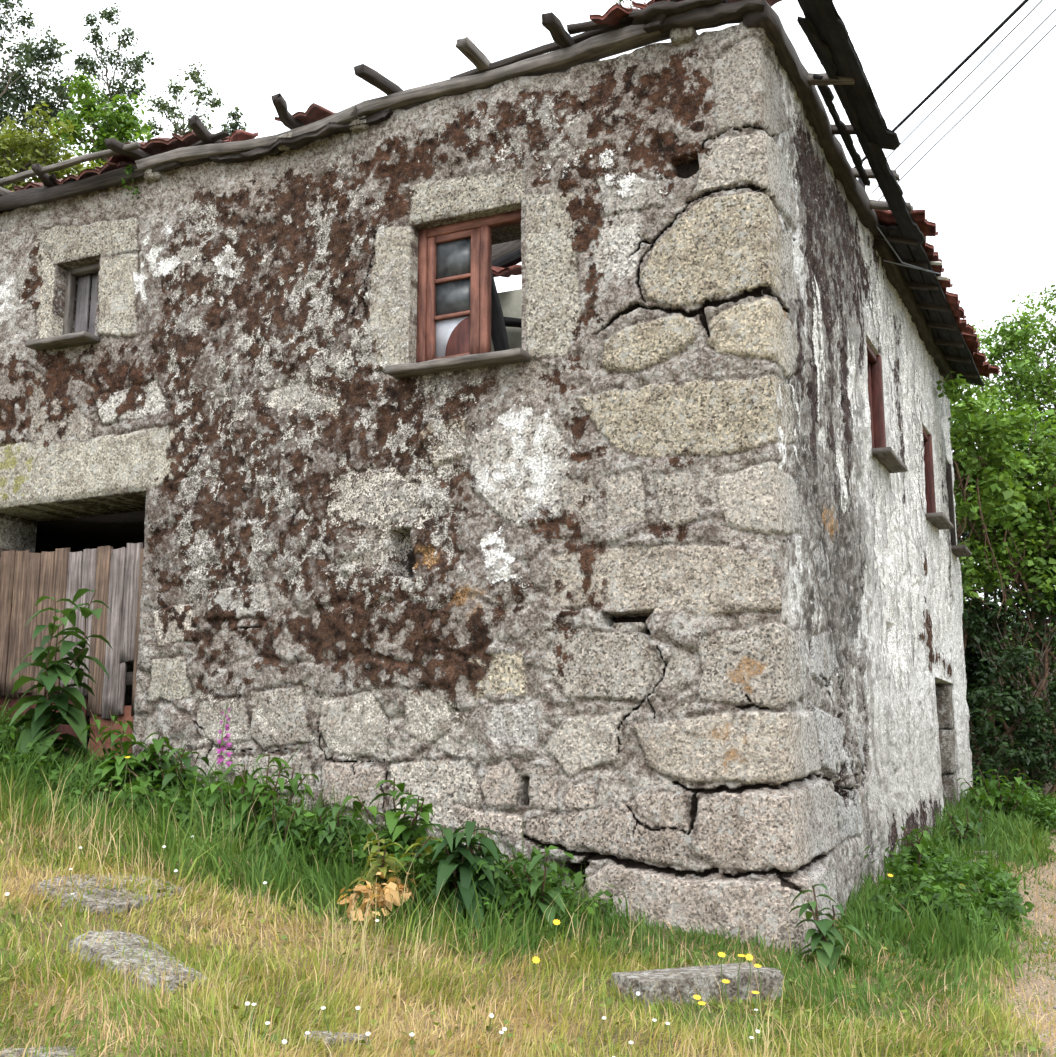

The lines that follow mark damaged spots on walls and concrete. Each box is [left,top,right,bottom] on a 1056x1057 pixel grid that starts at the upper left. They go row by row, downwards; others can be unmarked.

crack [596,184,788,338]
water stain [0,48,720,729]
water stain [788,103,928,711]
crack [617,646,667,753]
crack [733,695,769,709]
crack [524,835,827,894]
crack [626,773,860,835]
water stain [858,791,941,883]